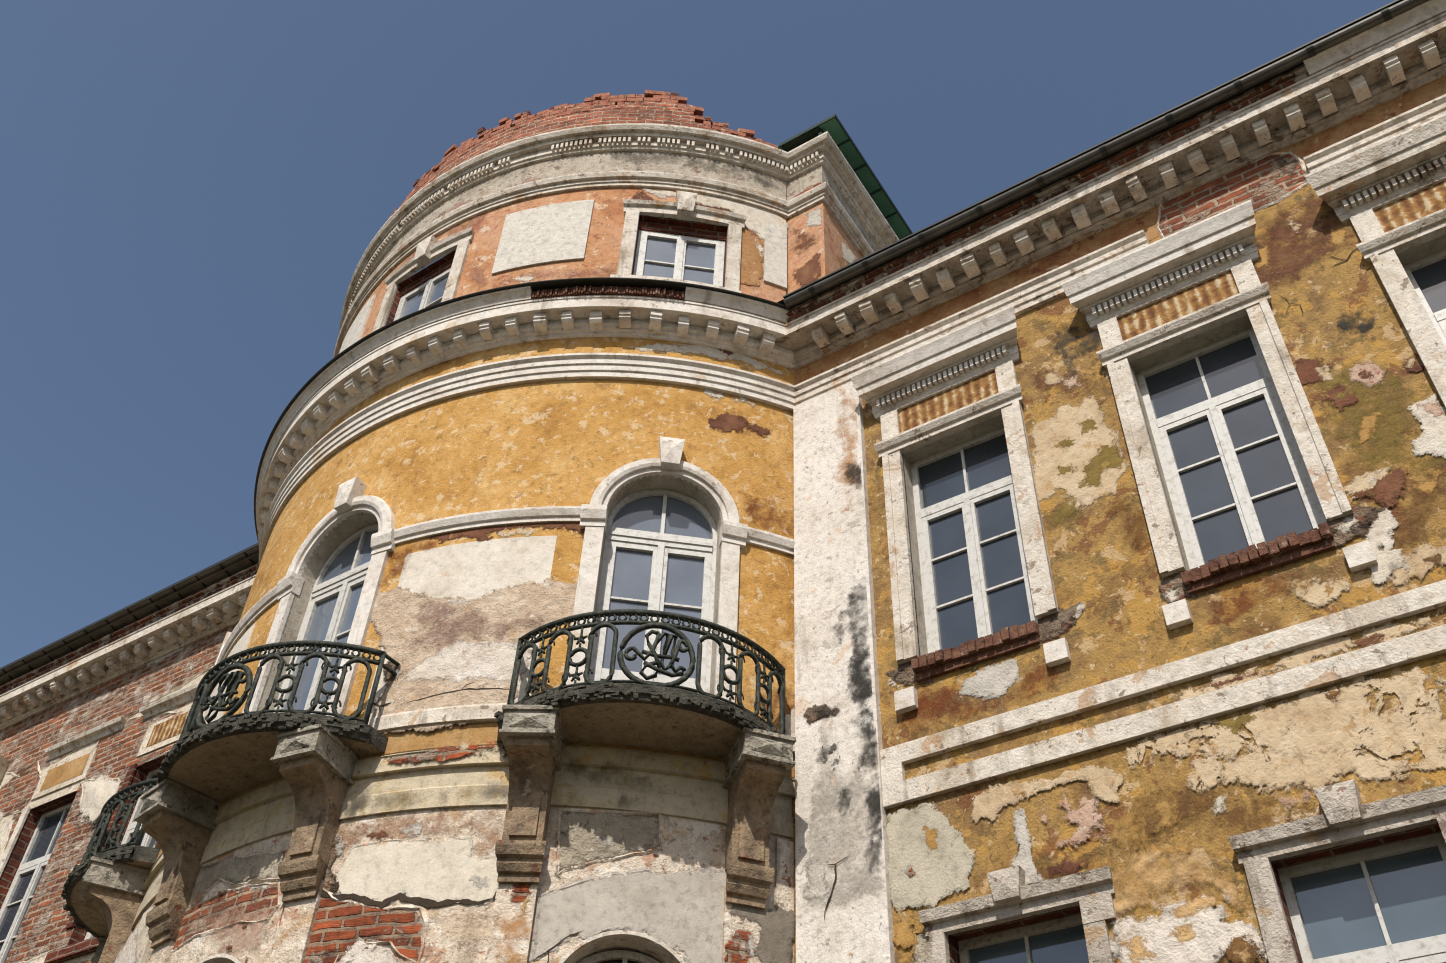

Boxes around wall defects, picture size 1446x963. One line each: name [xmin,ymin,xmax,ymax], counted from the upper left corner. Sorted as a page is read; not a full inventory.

spalling [1156,152,1350,286]
leakage [845,464,862,484]
peeling [1027,371,1131,525]
peeling [1293,353,1446,586]
peeling [370,578,577,734]
leakage [833,586,877,771]
spalling [0,622,239,963]
spalling [304,810,501,963]
spalling [469,807,664,961]
crack [824,856,849,918]
leakage [868,790,882,870]
peeling [802,666,1446,963]